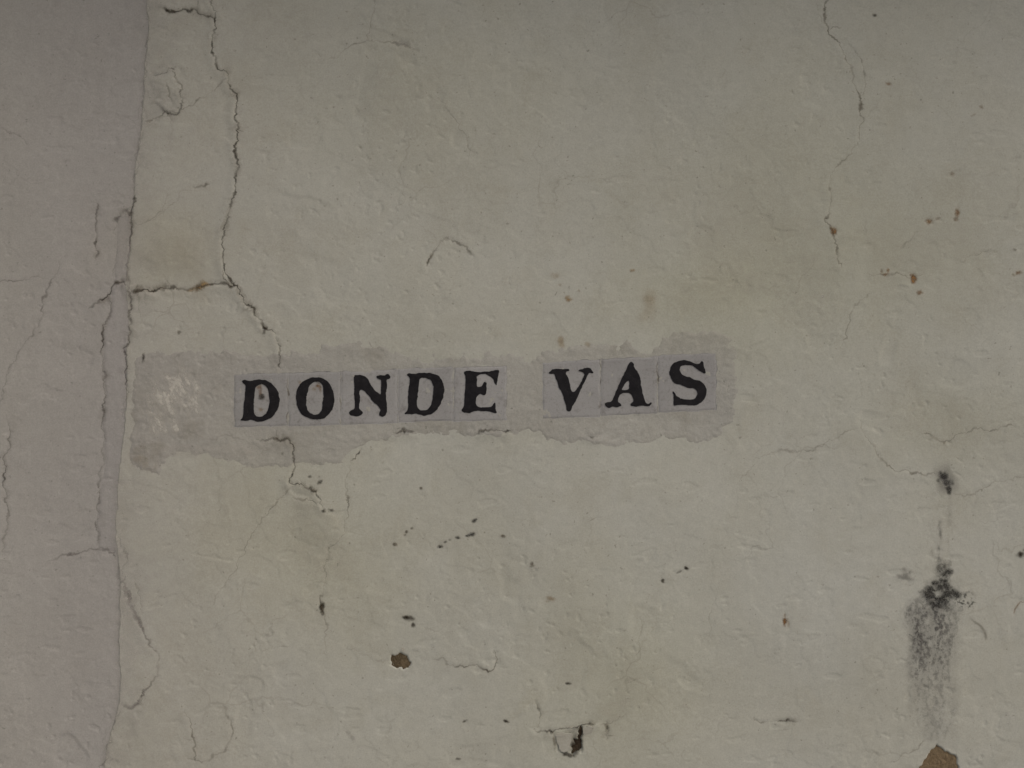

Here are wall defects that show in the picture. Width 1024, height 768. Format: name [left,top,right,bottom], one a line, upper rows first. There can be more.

crack [102,242,273,331]
leakage [910,565,973,662]
spalling [555,726,594,754]
spalling [919,745,958,768]